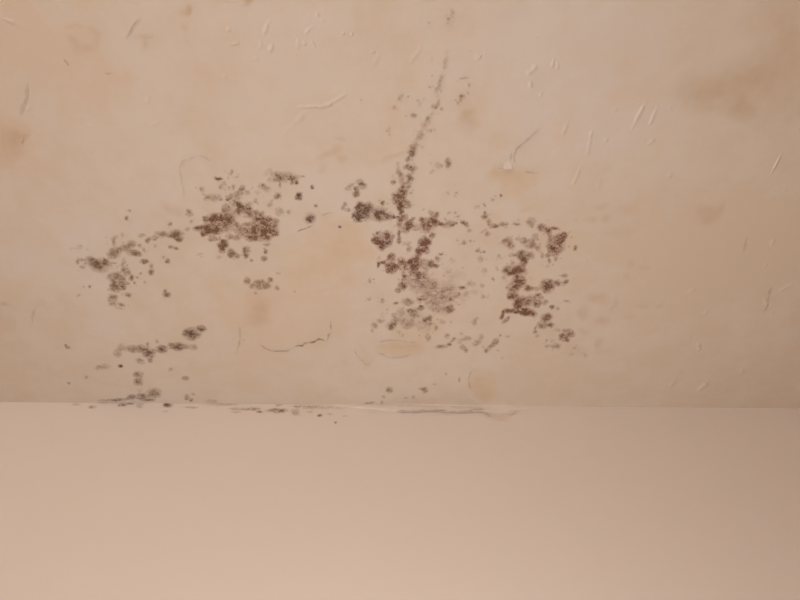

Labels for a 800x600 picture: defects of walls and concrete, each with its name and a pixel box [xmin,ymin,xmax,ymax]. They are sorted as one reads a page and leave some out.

damp [68,134,351,311]
damp [340,46,621,365]
damp [71,324,219,413]
damp [238,271,296,332]
crack [235,321,332,356]